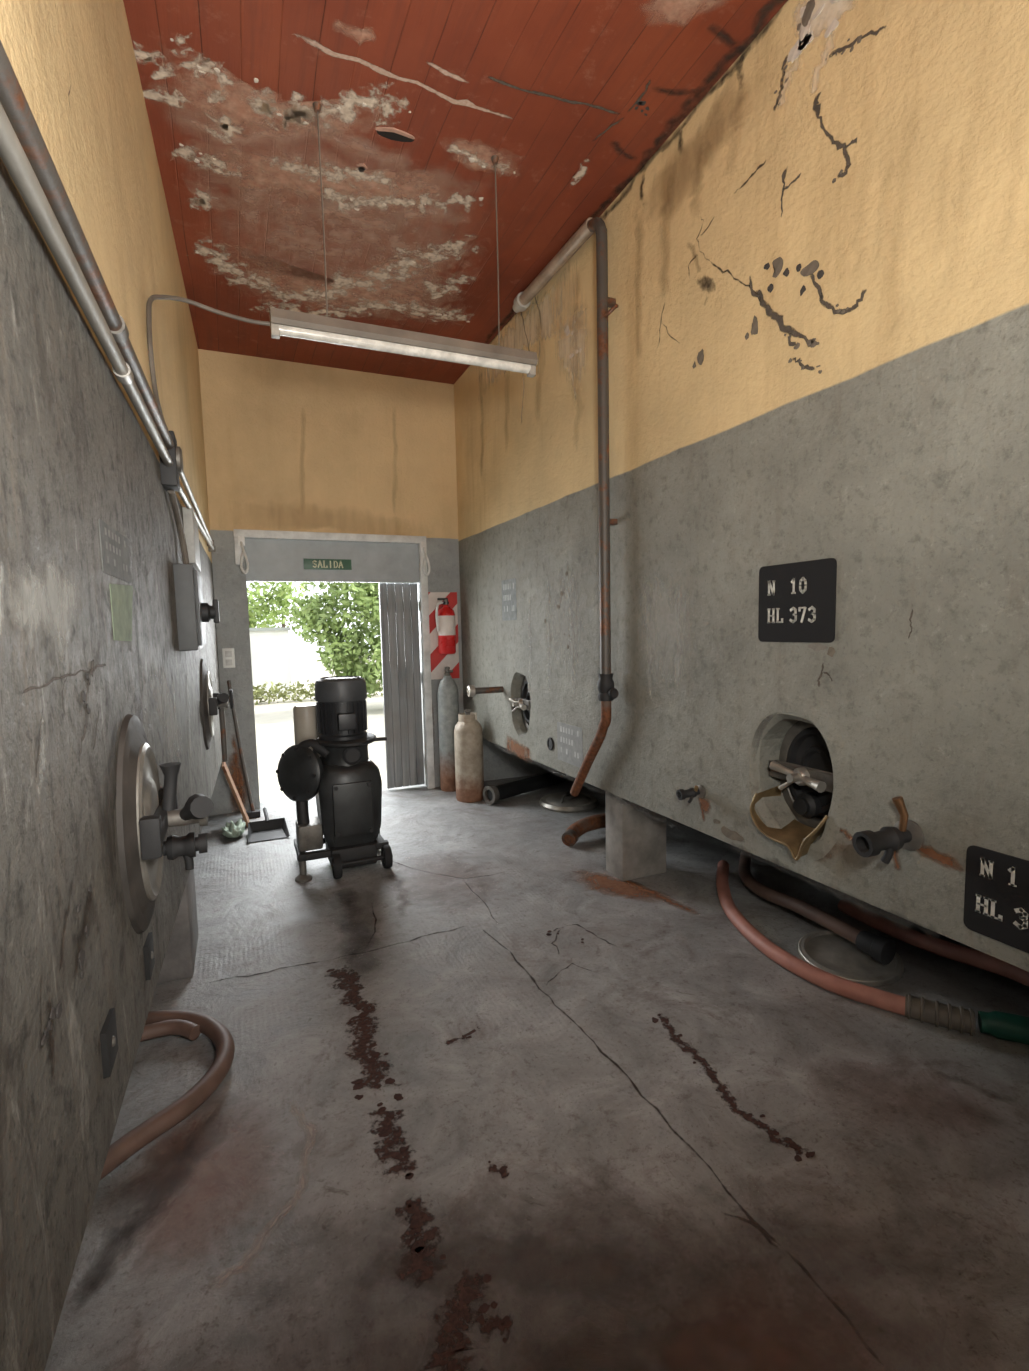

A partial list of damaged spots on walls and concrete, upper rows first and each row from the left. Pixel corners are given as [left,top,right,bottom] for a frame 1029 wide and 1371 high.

peeling [448,141,515,174]
peeling [571,160,589,185]
crack [740,26,886,216]
flaking render [781,0,851,104]
crack [688,219,866,374]
crack [218,862,876,1357]